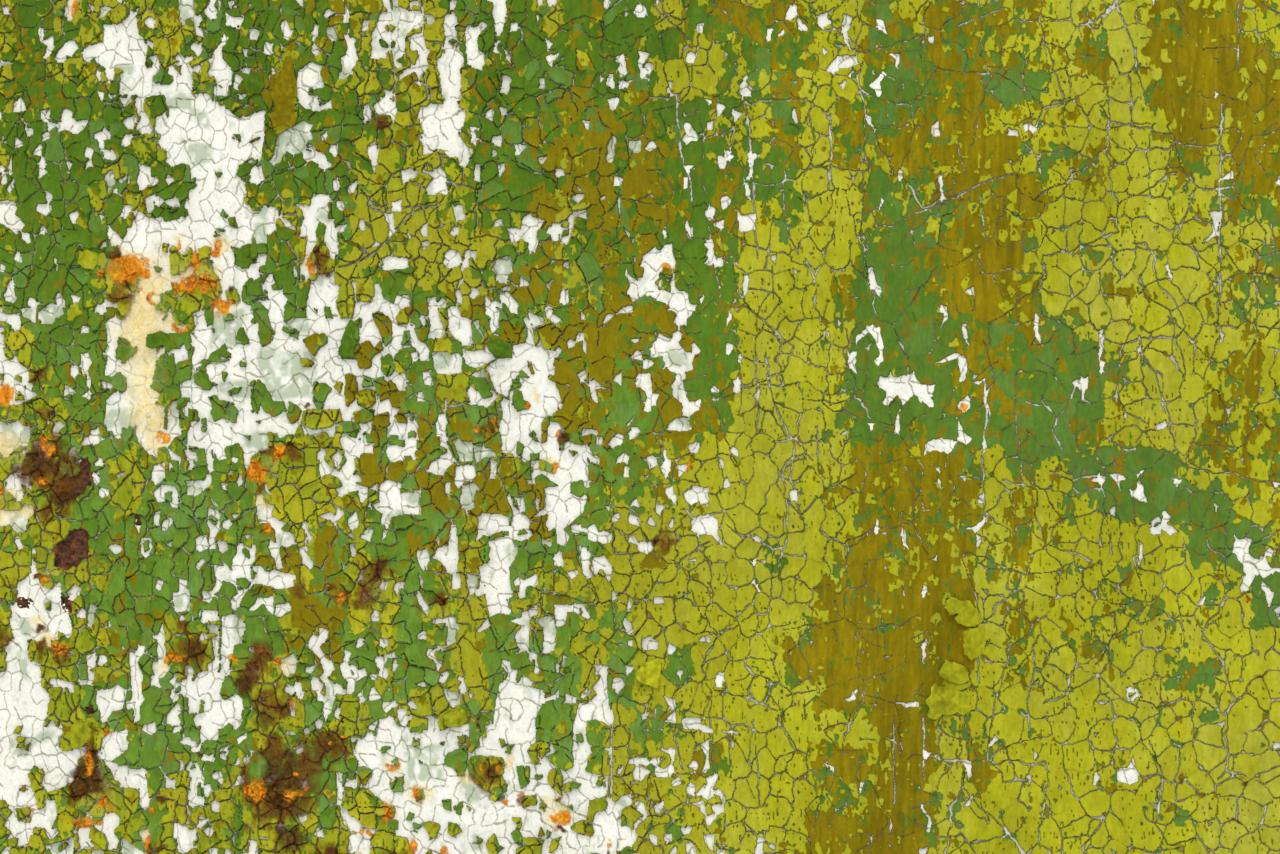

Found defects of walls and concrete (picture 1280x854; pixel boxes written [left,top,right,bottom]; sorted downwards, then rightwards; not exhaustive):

crack [676,94,711,236]
crack [1173,103,1224,295]
rust [97,239,235,449]
rust [0,434,80,522]
peeling [0,0,761,854]
crack [974,360,1075,512]
peeling [825,53,1280,854]
peeling [750,535,766,592]
rust [68,723,110,828]
rust [228,644,347,853]
peeling [755,836,776,854]
crack [892,717,934,809]